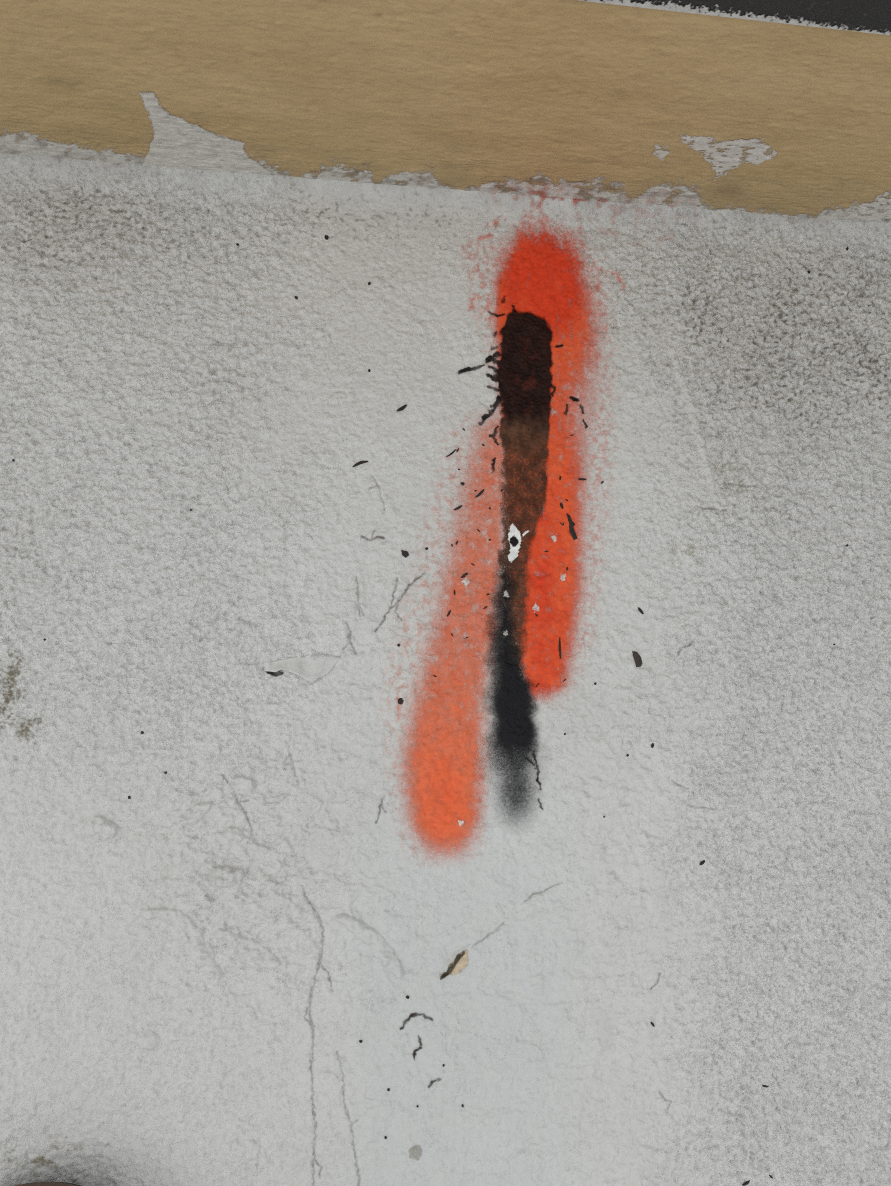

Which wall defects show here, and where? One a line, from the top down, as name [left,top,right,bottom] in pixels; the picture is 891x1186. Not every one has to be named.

peeling [0,92,891,223]